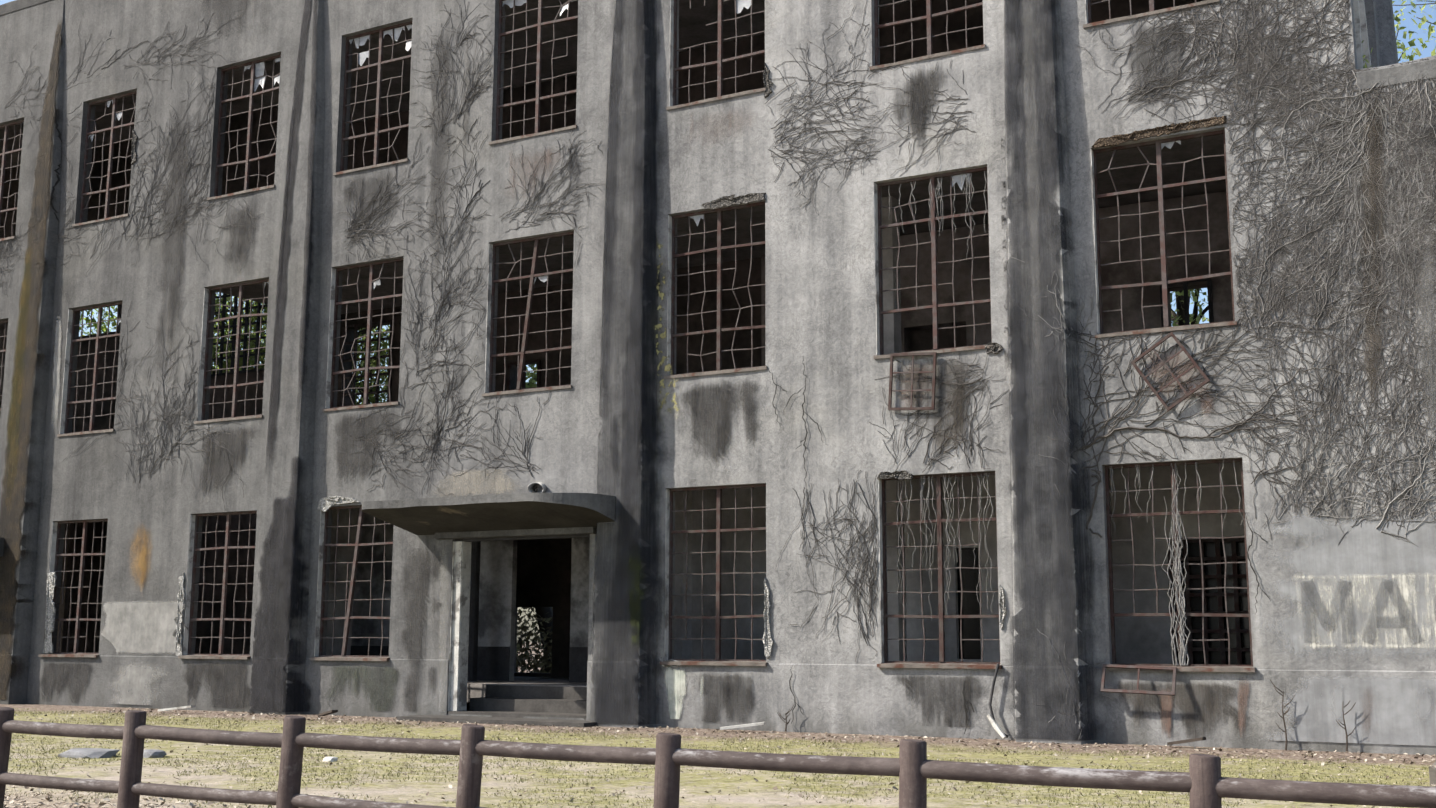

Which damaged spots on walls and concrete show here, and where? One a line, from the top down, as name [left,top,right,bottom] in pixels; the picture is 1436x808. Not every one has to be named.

damp [897,71,942,140]
damp [0,24,62,700]
damp [593,0,685,725]
damp [1001,0,1097,741]
damp [683,382,755,461]
spalling [44,571,57,654]
damp [702,674,753,723]
damp [898,676,981,727]